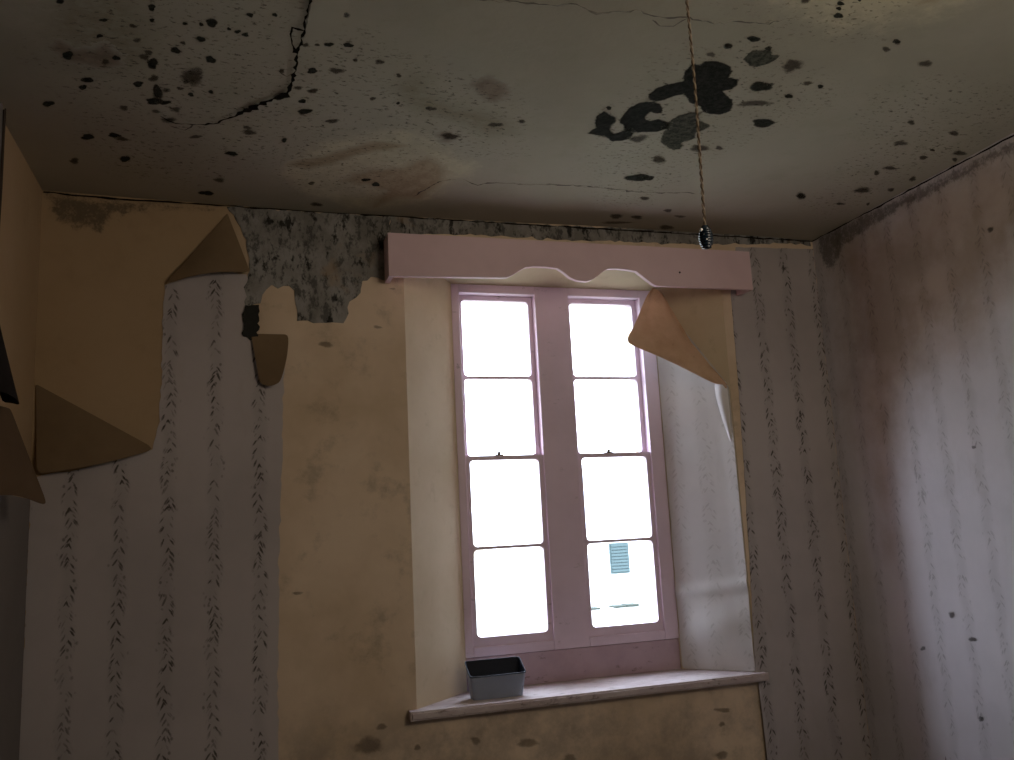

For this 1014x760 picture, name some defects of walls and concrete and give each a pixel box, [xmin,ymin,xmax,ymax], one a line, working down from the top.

damp [8,0,277,173]
crack [162,0,351,130]
crack [616,10,772,27]
damp [589,36,801,201]